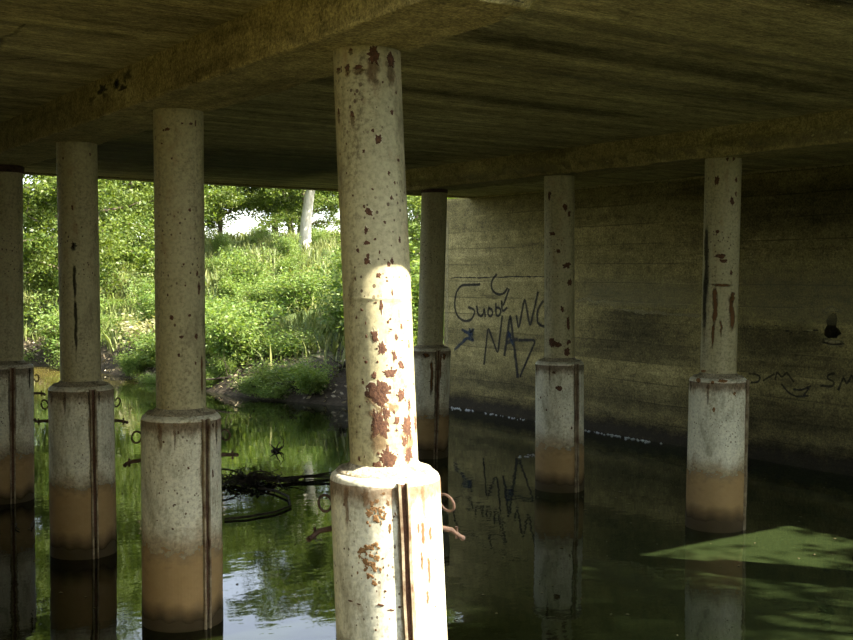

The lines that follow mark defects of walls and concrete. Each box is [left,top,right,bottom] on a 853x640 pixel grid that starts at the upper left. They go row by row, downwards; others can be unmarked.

corrosion [337,59,395,83]
corrosion [711,284,735,346]
leakage [49,401,117,560]
corrosion [329,479,398,534]
corrosion [368,398,397,449]
leakage [416,393,535,459]
leakage [573,371,688,448]
leakage [685,466,744,533]
leakage [748,439,853,476]
leakage [141,537,223,633]
corrosion [357,542,385,587]
corrosion [410,479,441,604]